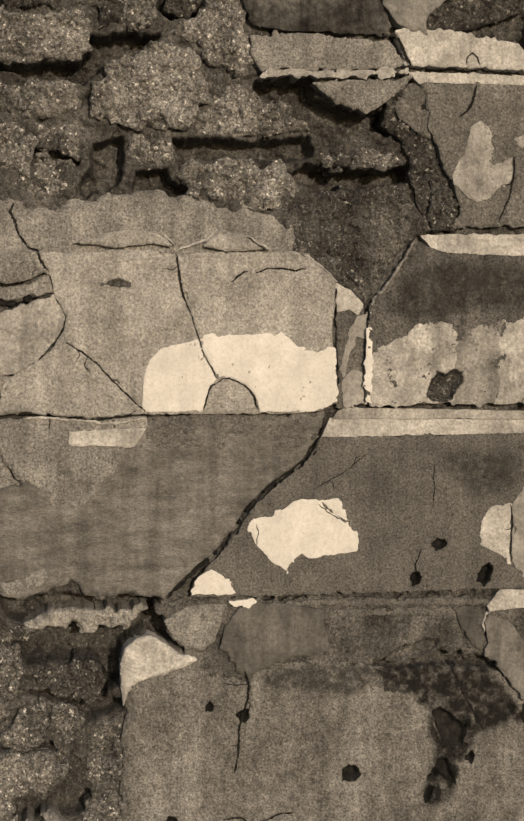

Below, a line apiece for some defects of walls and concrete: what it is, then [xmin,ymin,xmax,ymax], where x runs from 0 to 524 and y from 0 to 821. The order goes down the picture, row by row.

flaking render [426,0,524,33]
crack [0,203,50,306]
crack [165,255,258,410]
crack [17,343,153,429]
crack [167,428,322,599]
crack [223,671,251,773]
crack [225,812,295,821]